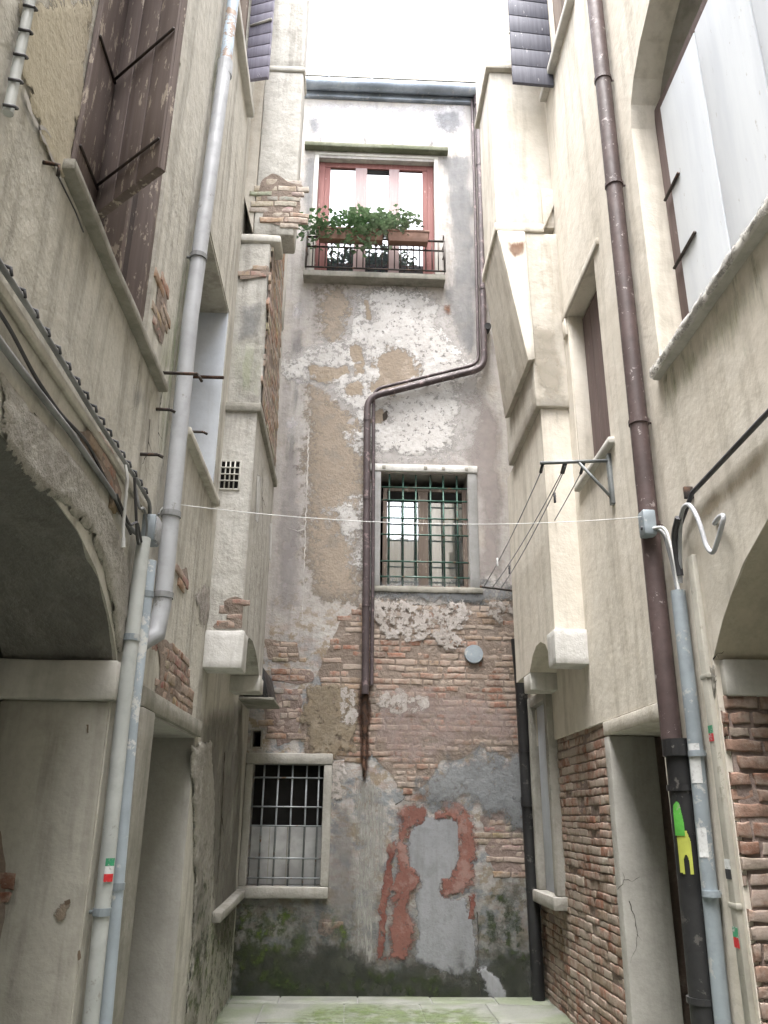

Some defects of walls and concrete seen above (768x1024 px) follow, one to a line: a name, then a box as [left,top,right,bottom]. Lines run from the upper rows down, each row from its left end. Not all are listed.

flaking render [250,174,309,230]
flaking render [151,267,171,344]
flaking render [175,564,250,629]
flaking render [238,247,525,961]
flaking render [152,640,194,715]
corrosion [358,682,371,779]
leakage [203,709,532,998]
spalling [54,899,70,921]
crack [618,874,640,958]